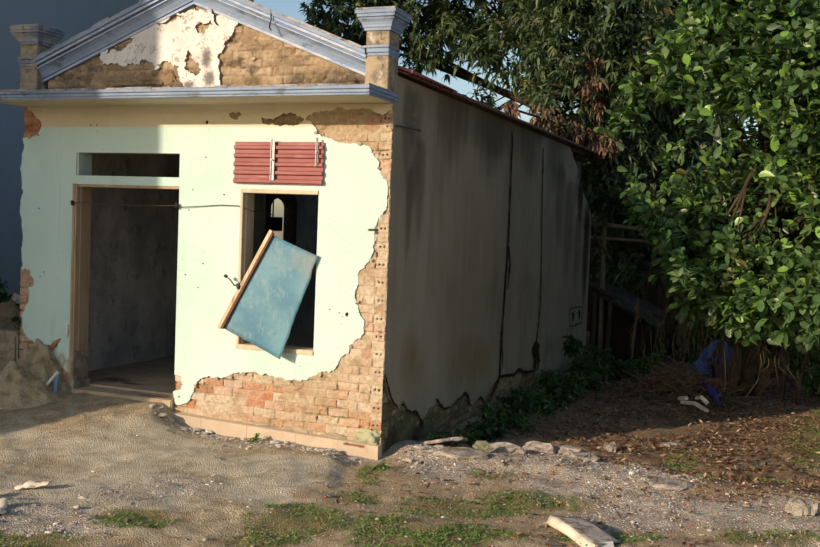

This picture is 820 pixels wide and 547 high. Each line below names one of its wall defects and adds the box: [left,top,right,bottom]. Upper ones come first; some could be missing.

flaking render [48,5,365,89]
spalling [24,108,41,139]
flaking render [19,266,34,358]
flaking render [174,106,571,454]
crack [437,132,544,410]
crack [385,374,424,427]